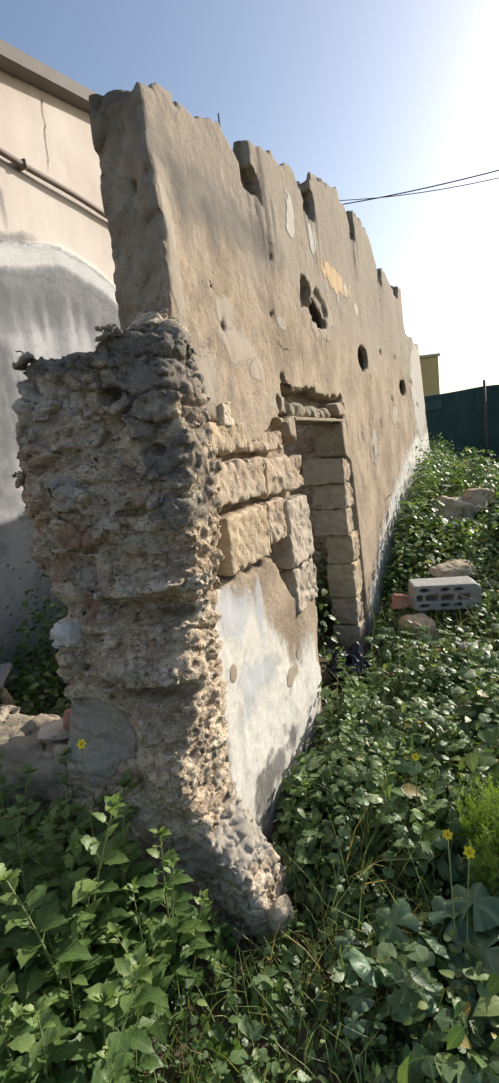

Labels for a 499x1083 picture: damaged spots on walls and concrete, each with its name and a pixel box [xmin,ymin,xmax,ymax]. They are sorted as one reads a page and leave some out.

peeling [284,188,295,237]
spalling [308,223,358,344]
leakage [0,268,197,436]
spalling [195,342,219,416]
spalling [269,395,286,413]
leakage [256,724,296,826]